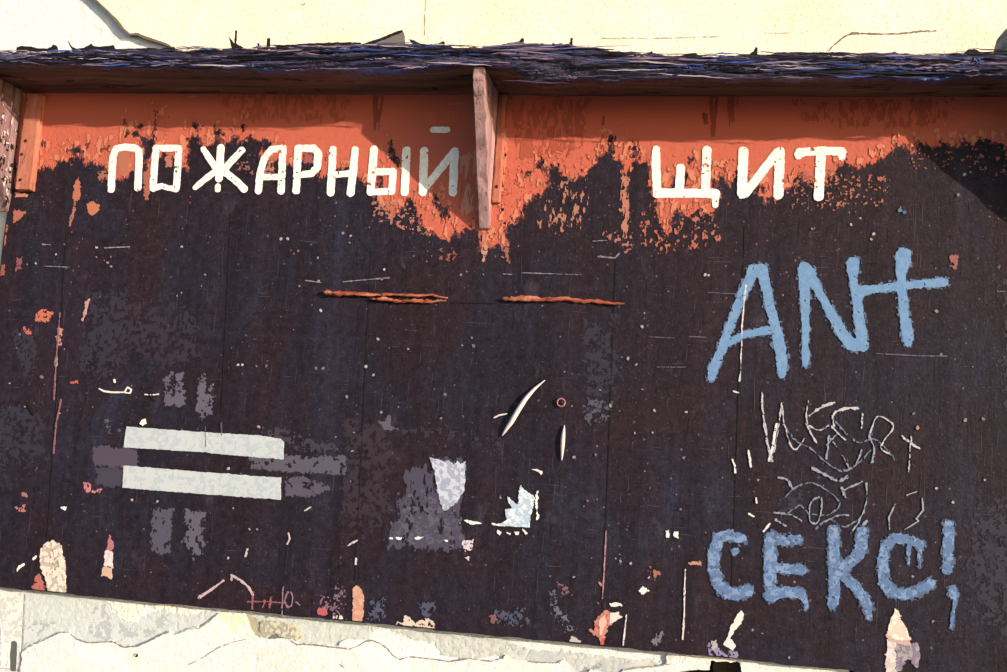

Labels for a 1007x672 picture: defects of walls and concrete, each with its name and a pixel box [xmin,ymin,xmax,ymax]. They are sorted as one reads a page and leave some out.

peeling [0,93,1007,276]
peeling [12,309,63,388]
peeling [70,287,206,384]
peeling [579,313,623,402]
peeling [0,400,48,473]